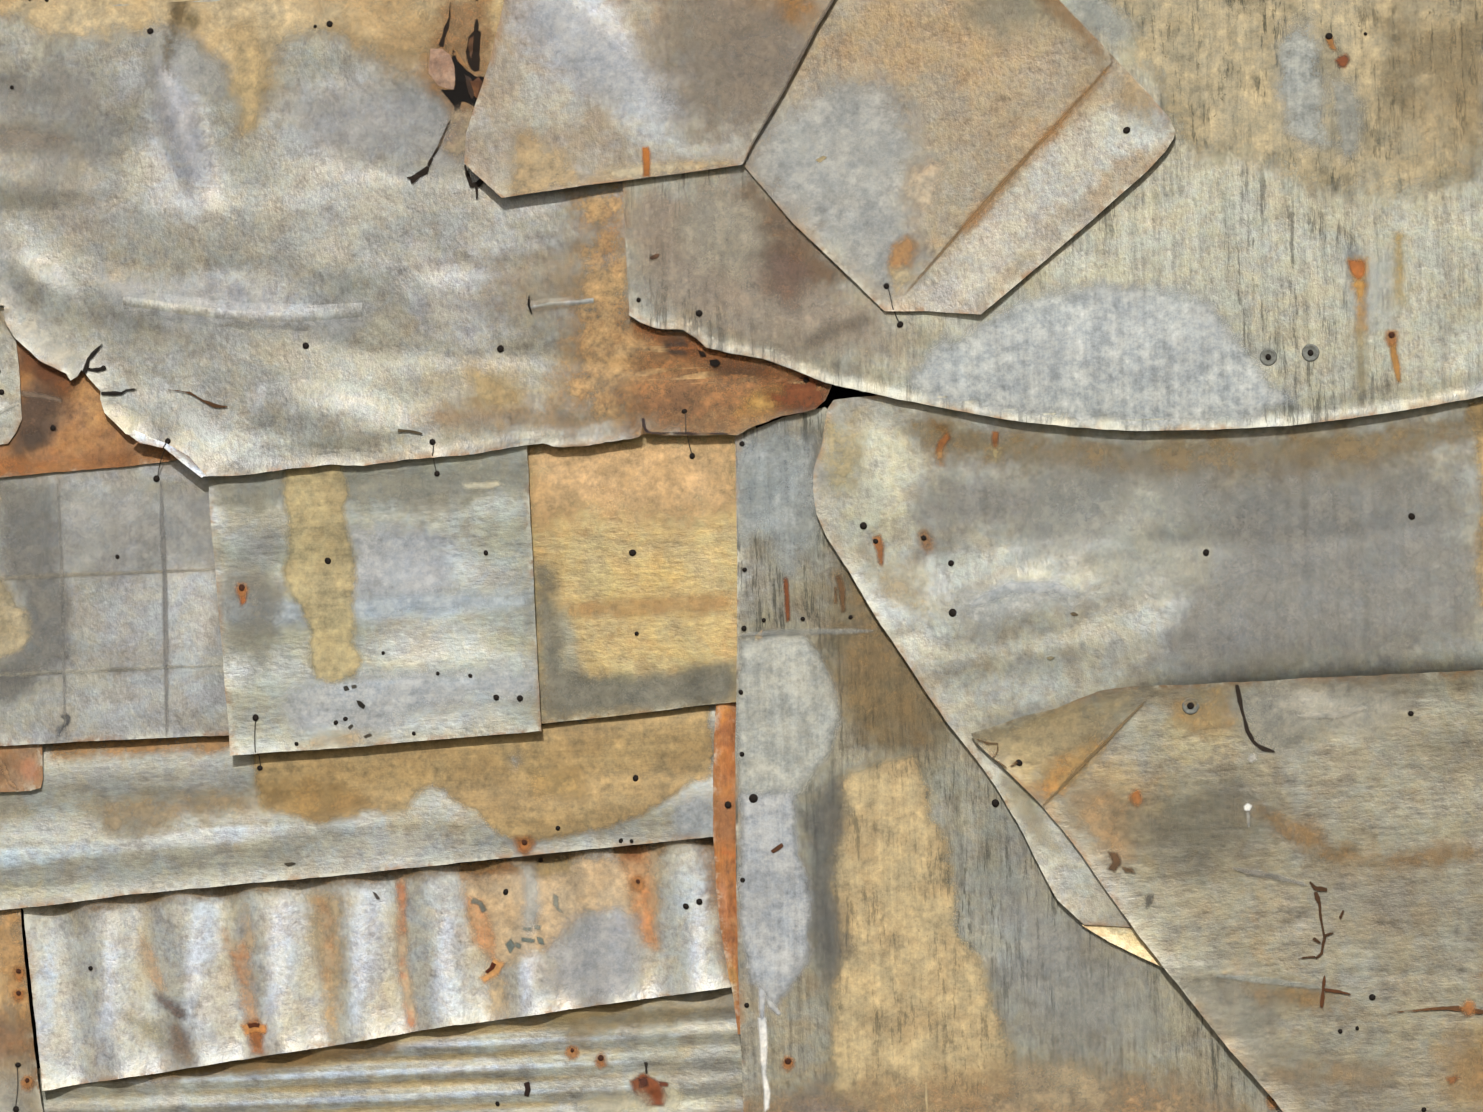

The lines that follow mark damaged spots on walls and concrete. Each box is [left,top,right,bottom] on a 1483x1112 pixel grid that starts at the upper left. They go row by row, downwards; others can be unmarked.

corrosion [25,351,74,396]
water stain [0,484,210,696]
water stain [99,464,839,1018]
water stain [985,702,1118,756]
crack [1235,685,1275,752]
corrosion [90,892,174,910]
corrosion [162,928,393,1078]
corrosion [195,838,666,1026]
water stain [830,758,1120,1112]
crack [1298,881,1350,1008]
water stain [587,1095,645,1112]
corrosion [630,1073,680,1109]